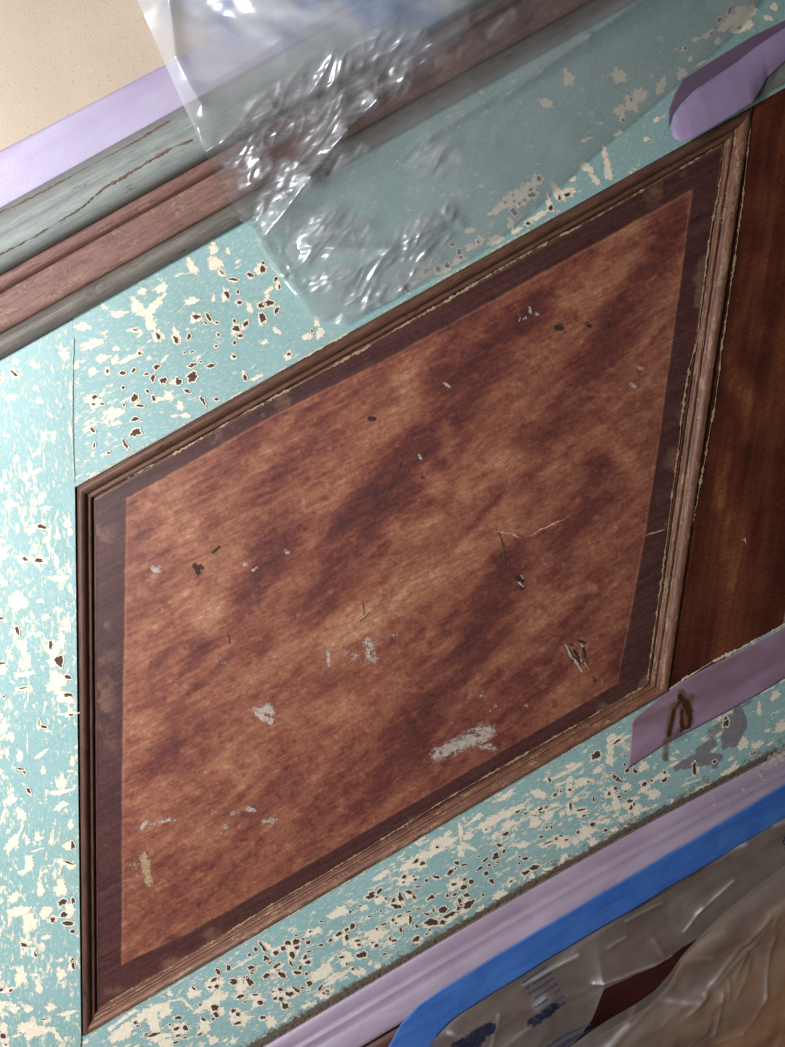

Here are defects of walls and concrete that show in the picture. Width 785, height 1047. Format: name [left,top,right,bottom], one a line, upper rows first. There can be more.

peeling [598,2,778,137]
peeling [0,367,20,400]
peeling [692,122,751,526]
peeling [0,520,70,582]
peeling [26,505,52,536]
peeling [56,137,725,1001]
peeling [715,715,730,735]
peeling [668,624,785,691]
peeling [757,679,785,716]
peeling [0,577,80,1047]
peeling [107,719,785,1047]
crack [247,745,785,1047]